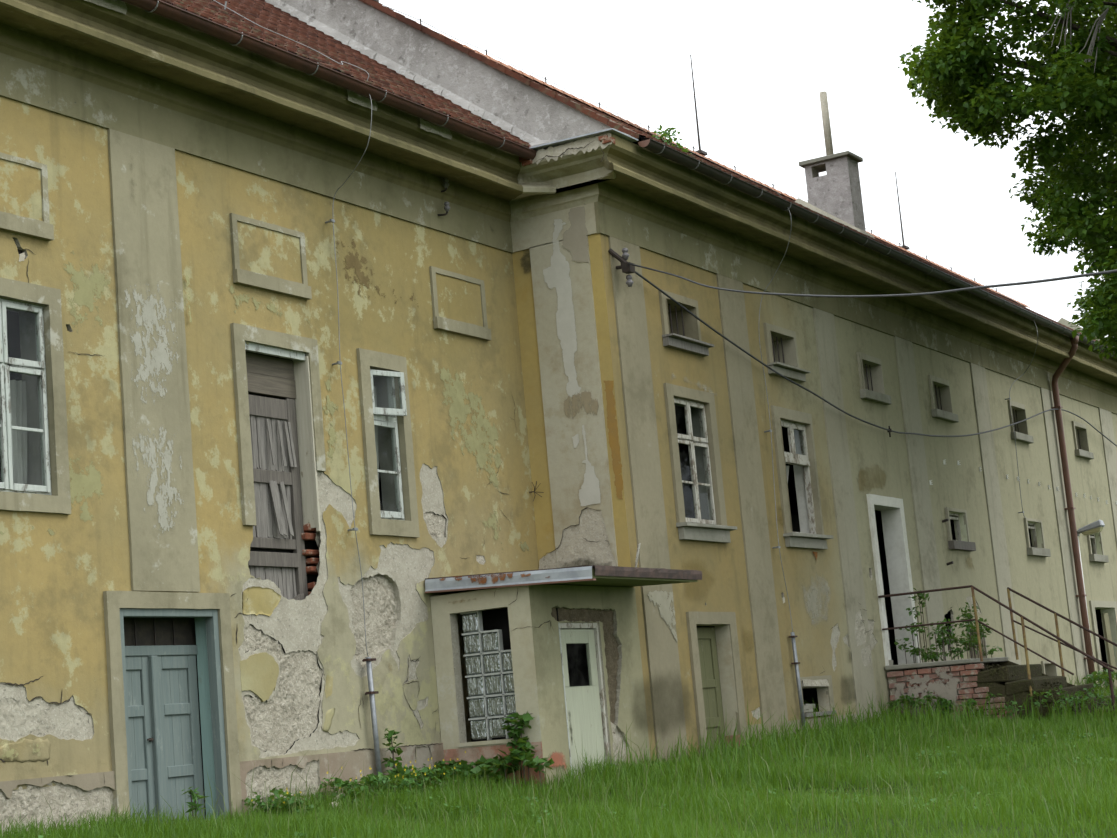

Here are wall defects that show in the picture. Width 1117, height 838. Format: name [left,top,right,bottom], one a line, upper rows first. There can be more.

spalling [519,133,615,166]
peeling [124,272,192,403]
spalling [539,219,623,569]
peeling [132,427,184,533]
crack [540,507,606,559]
spalling [238,464,448,814]
spalling [0,682,93,759]
spalling [0,781,115,837]